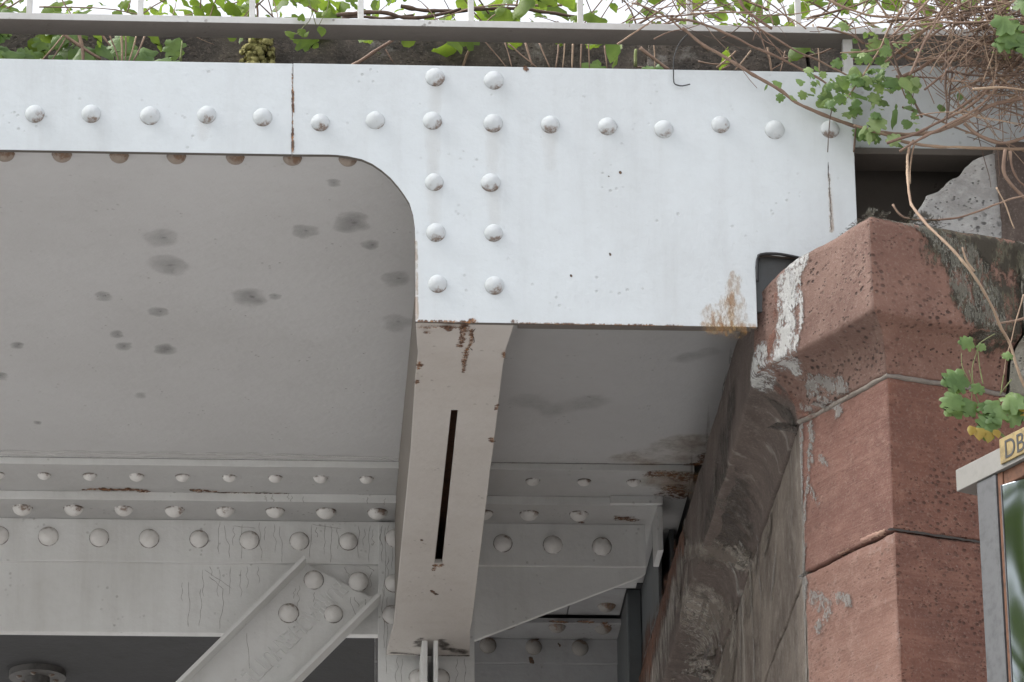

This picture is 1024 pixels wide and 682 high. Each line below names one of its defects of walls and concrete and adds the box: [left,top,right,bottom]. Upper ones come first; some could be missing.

rust [418,318,476,373]
rust [644,453,705,499]
water stain [750,253,852,680]
crack [181,493,403,682]